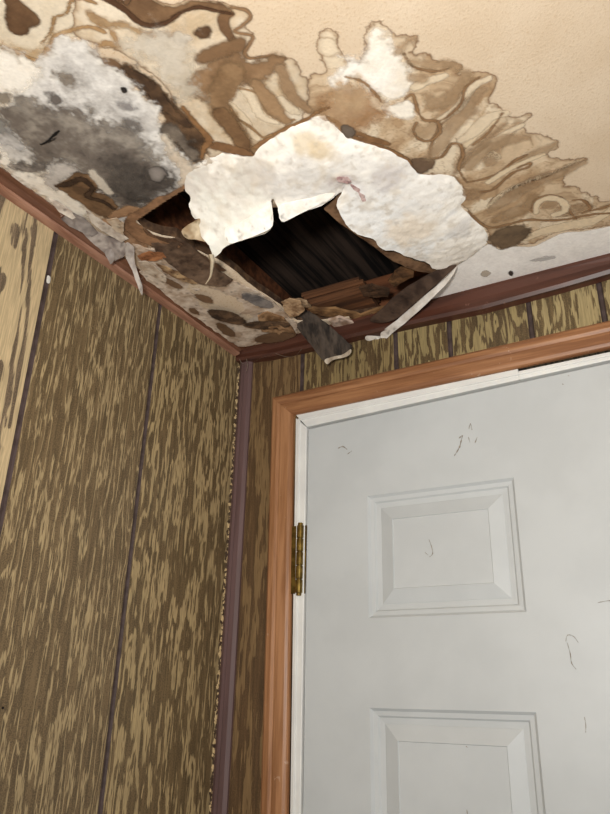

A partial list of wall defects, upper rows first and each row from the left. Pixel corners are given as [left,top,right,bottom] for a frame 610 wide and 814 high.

peeling [0,49,42,119]
leakage [0,0,610,249]
peeling [0,116,610,347]